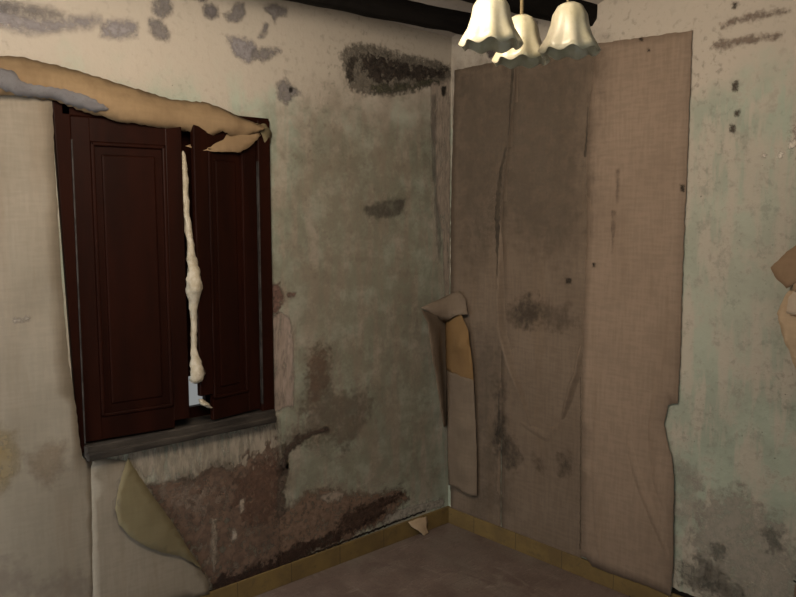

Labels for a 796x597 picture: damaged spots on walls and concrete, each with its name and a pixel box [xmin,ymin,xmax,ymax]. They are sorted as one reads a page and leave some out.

spalling [117,312,410,590]
damp [678,483,796,597]